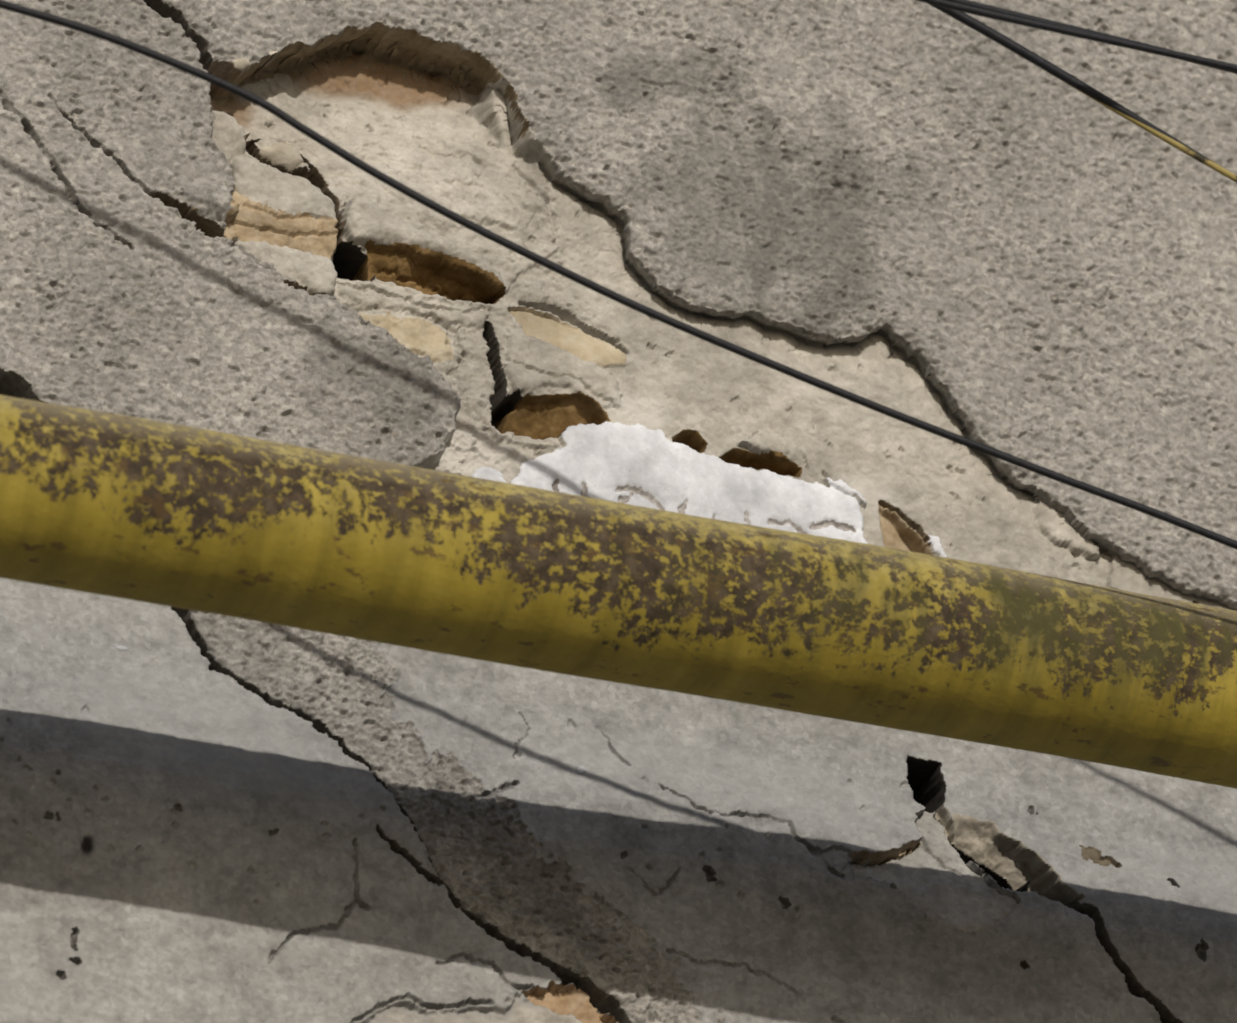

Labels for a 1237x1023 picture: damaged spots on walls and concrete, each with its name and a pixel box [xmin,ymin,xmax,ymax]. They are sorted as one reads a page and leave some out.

crack [144,0,213,70]
crack [0,90,157,250]
flaking render [149,22,1237,611]
crack [0,368,48,403]
crack [171,607,632,1023]
crack [658,783,846,879]
crack [627,866,681,896]
flaking render [351,981,619,1023]
crack [1068,901,1183,1023]